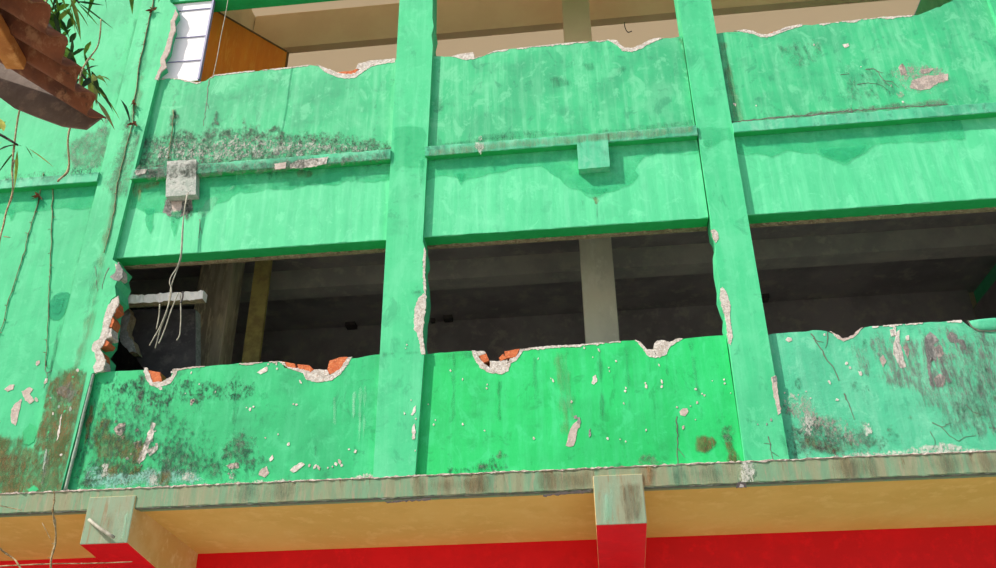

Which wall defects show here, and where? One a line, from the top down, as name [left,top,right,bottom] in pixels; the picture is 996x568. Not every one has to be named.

damp [110,110,391,192]
spalling [91,296,124,374]
spalling [143,366,205,390]
spalling [239,357,352,384]
spalling [472,341,621,389]
spalling [405,227,719,355]
spalling [635,338,683,366]
spalling [720,287,733,345]
crack [811,332,855,420]
peeling [4,385,72,445]
damp [77,376,284,489]
damp [740,462,754,482]